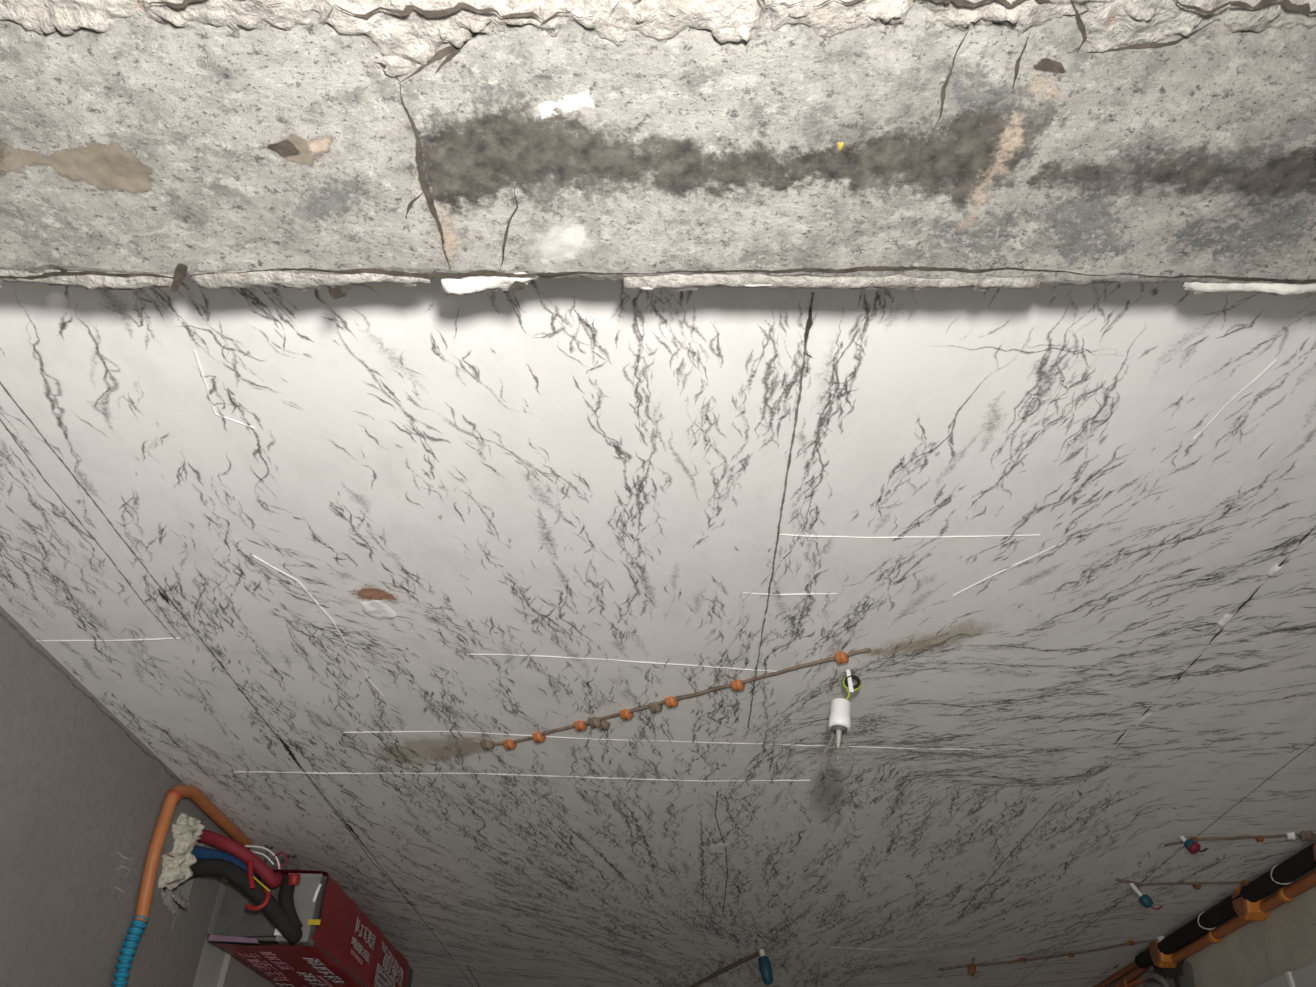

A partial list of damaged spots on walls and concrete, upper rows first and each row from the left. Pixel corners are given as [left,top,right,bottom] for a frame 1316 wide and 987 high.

spalling [0,0,1316,77]
spalling [1034,58,1065,99]
leakage [0,141,152,193]
spalling [268,134,333,164]
crack [0,20,1316,284]
leakage [408,62,1316,280]
rust [352,585,397,603]